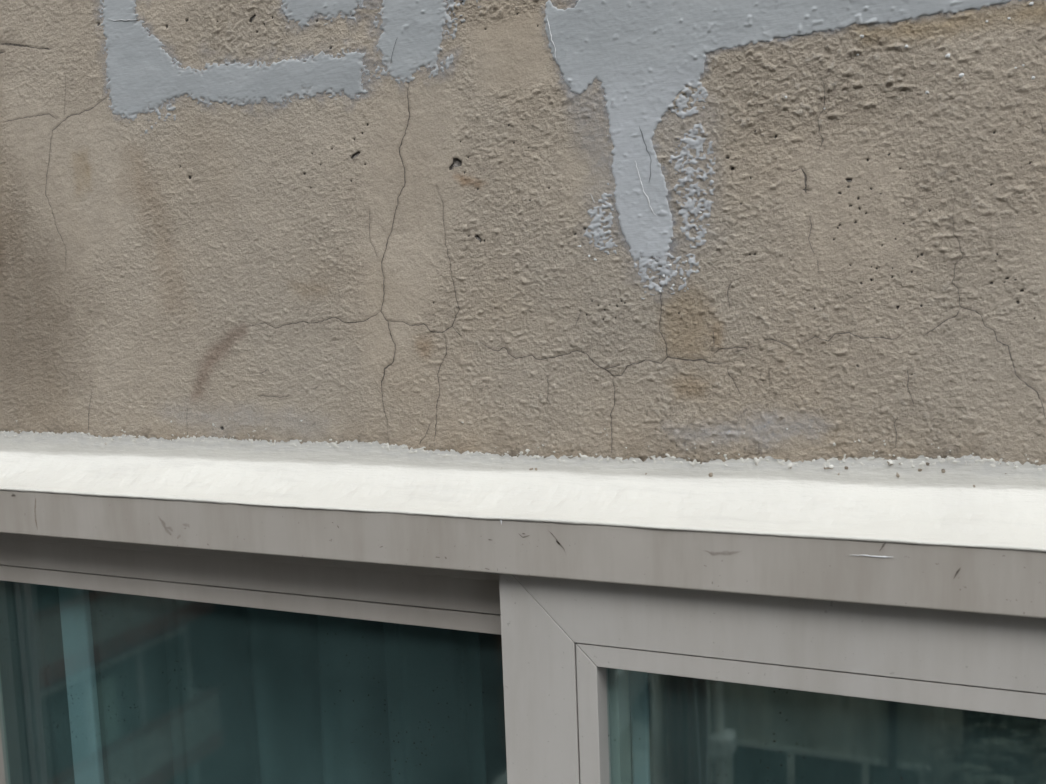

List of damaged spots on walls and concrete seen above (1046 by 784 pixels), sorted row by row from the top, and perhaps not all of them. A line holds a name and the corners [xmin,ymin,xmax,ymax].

crack [6,76,109,262]
crack [244,86,898,452]
crack [927,198,1046,419]